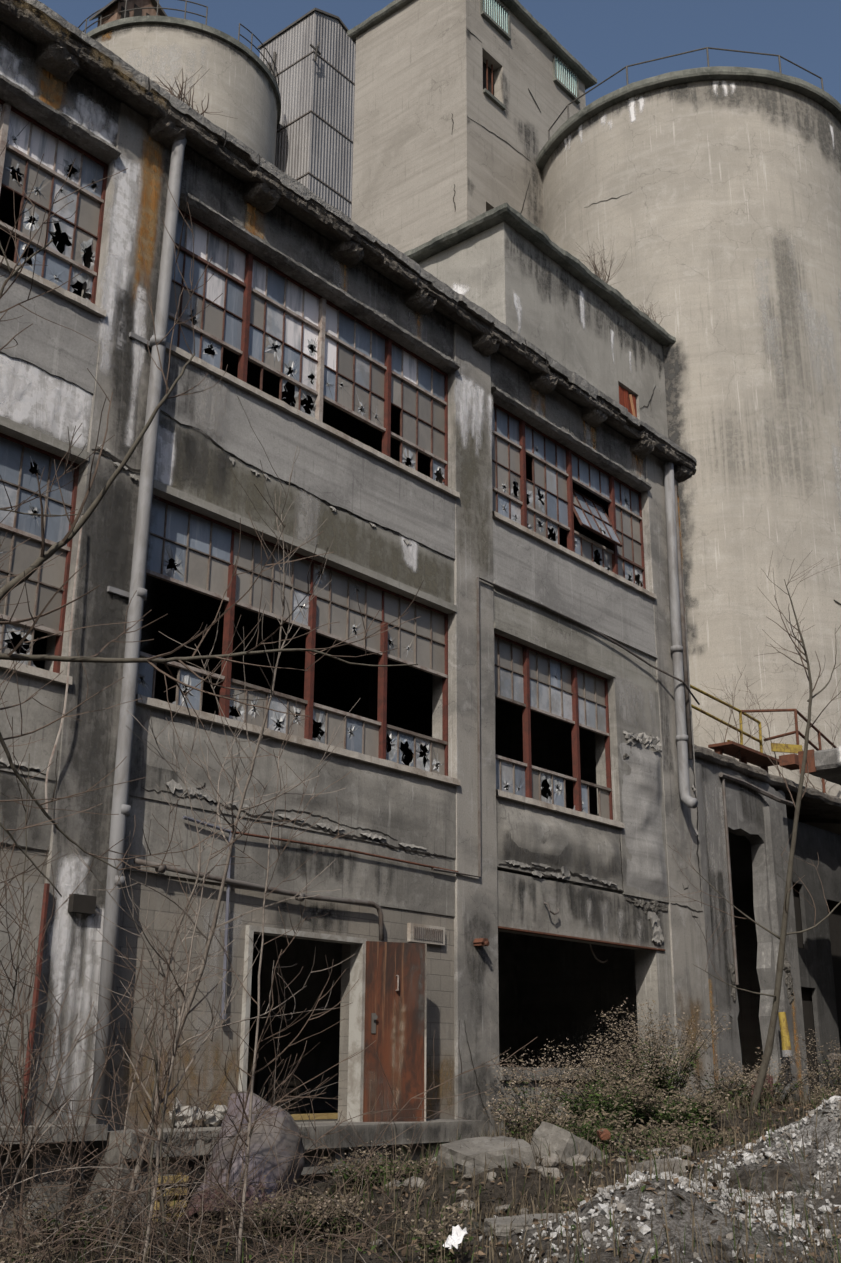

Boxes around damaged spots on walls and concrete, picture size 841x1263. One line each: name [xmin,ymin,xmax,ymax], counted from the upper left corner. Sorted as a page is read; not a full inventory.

leakage [0,31,35,95]
leakage [63,76,118,144]
leakage [94,24,277,107]
corrosion [136,136,161,287]
leakage [0,352,92,447]
leakage [100,148,450,603]
leakage [508,235,684,448]
leakage [678,482,701,652]
leakage [34,462,138,1118]
leakage [556,882,663,947]